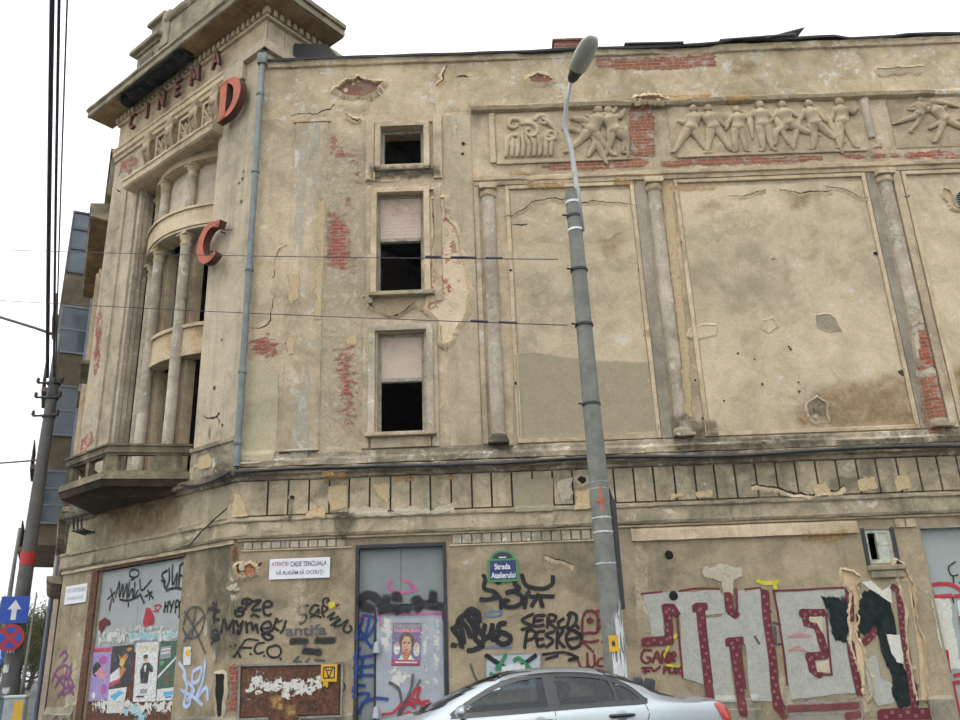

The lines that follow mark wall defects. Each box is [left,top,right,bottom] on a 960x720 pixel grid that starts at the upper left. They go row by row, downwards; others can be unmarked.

flaking render [596,52,716,70]
crack [292,102,359,126]
flaking render [330,73,389,125]
flaking render [541,92,823,171]
flaking render [312,133,401,319]
crack [504,197,637,226]
crack [729,186,869,202]
flaking render [360,193,475,350]
flaking render [916,322,949,433]
leakage [669,422,824,452]
crack [750,484,846,500]
flaking render [227,560,260,605]